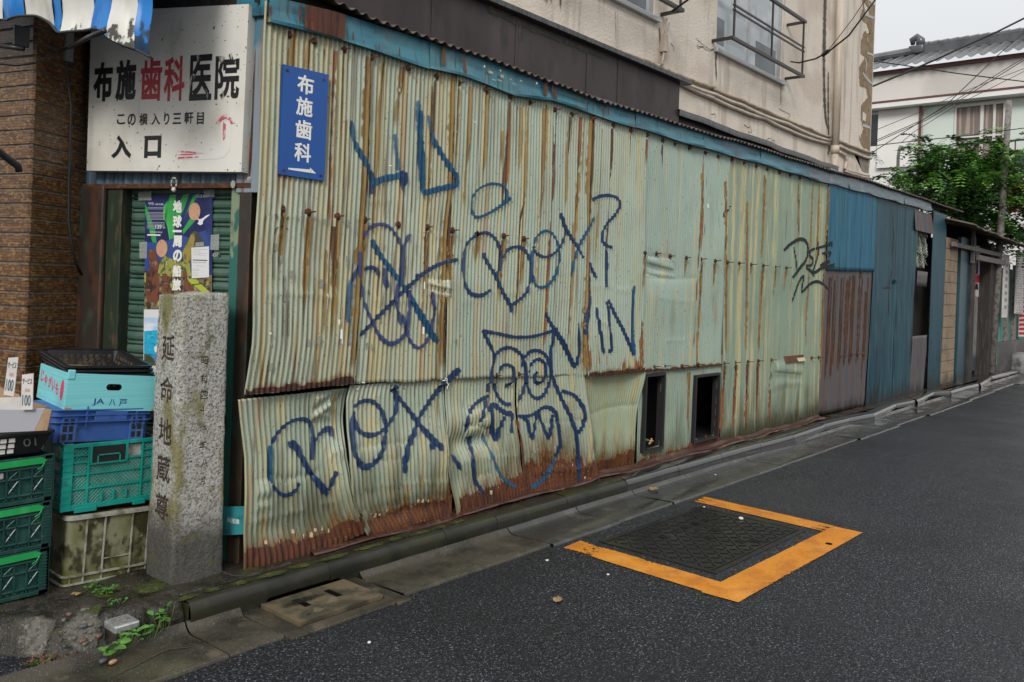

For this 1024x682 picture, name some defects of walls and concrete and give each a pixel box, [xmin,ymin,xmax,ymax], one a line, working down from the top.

flaking render [855,0,876,173]
rust [244,44,819,569]
rust [797,181,869,381]